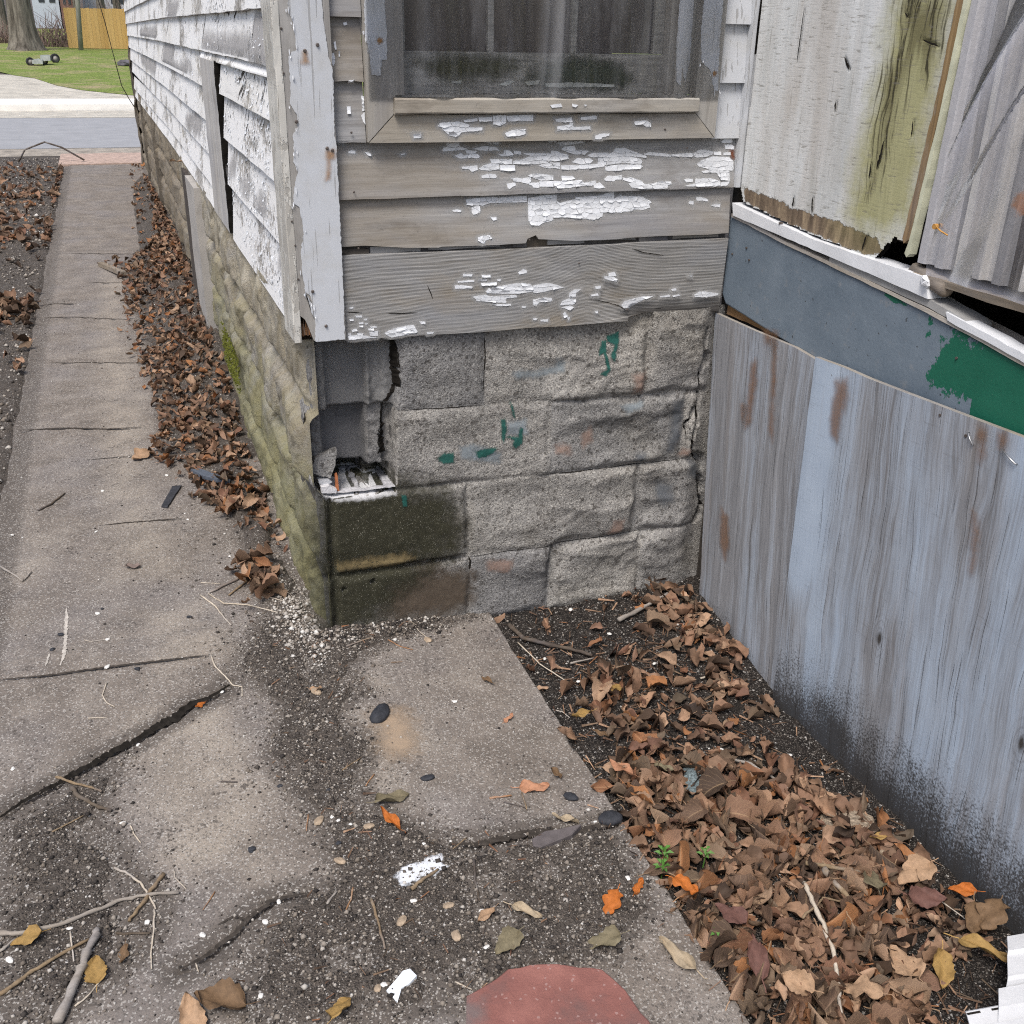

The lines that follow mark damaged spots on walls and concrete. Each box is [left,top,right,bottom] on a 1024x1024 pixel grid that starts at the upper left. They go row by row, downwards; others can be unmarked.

peeling [436,104,735,246]
peeling [453,268,619,323]
peeling [620,287,680,309]
peeling [693,290,719,299]
spalling [312,447,339,494]
crack [377,337,486,454]
crack [535,370,703,508]
corrosion [832,383,846,438]
damp [306,457,474,630]
crack [0,684,230,818]